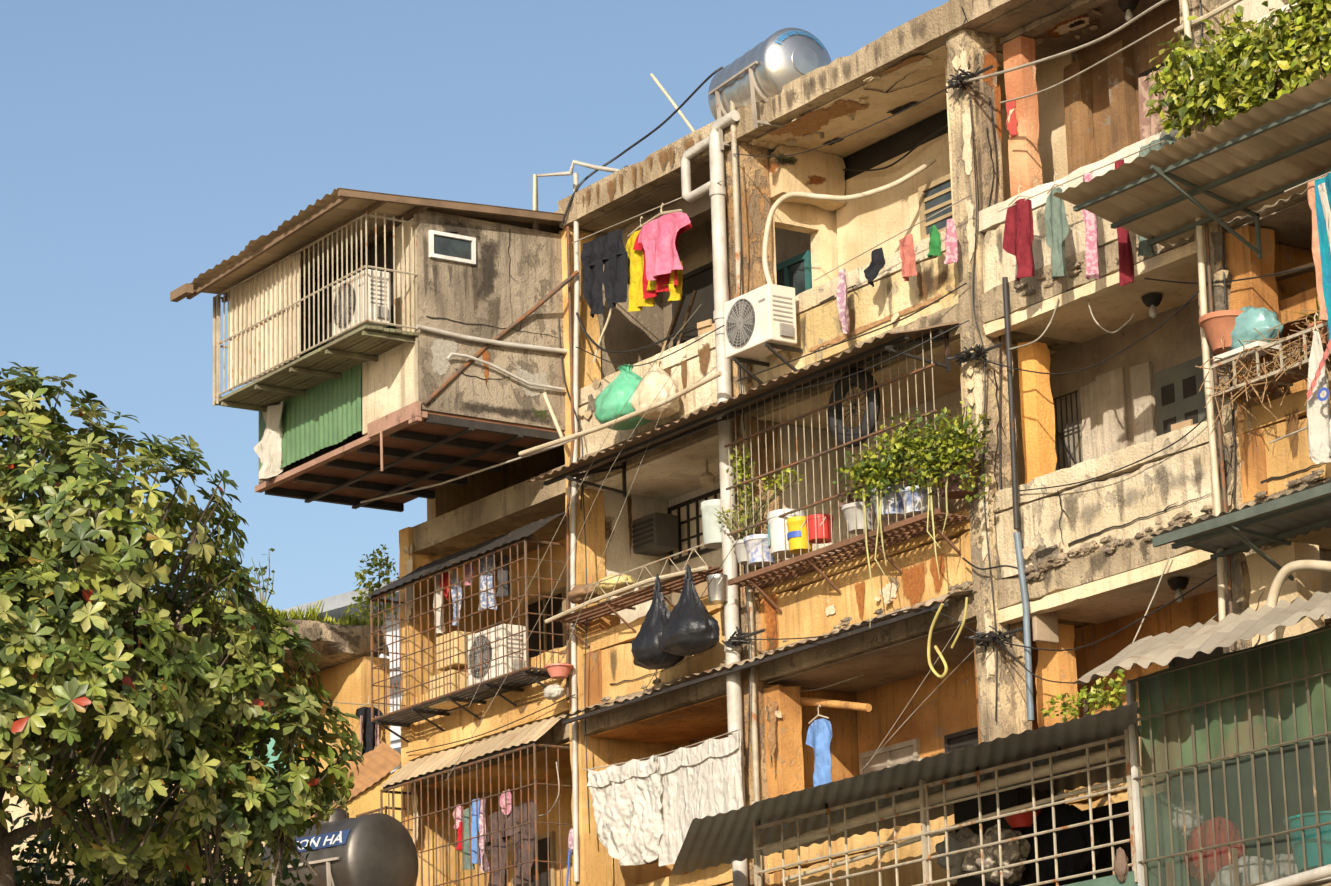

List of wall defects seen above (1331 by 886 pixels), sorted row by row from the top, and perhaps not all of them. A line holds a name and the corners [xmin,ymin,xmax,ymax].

peeling [952,46,971,81]
flaking render [751,100,869,149]
peeling [962,108,972,175]
damp [440,222,498,299]
peeling [965,199,975,263]
damp [465,403,548,422]
peeling [966,358,984,441]
peeling [979,486,1005,594]
spalling [1016,436,1233,584]
spalling [826,604,852,633]
spalling [947,580,975,599]
peeling [984,606,1010,679]